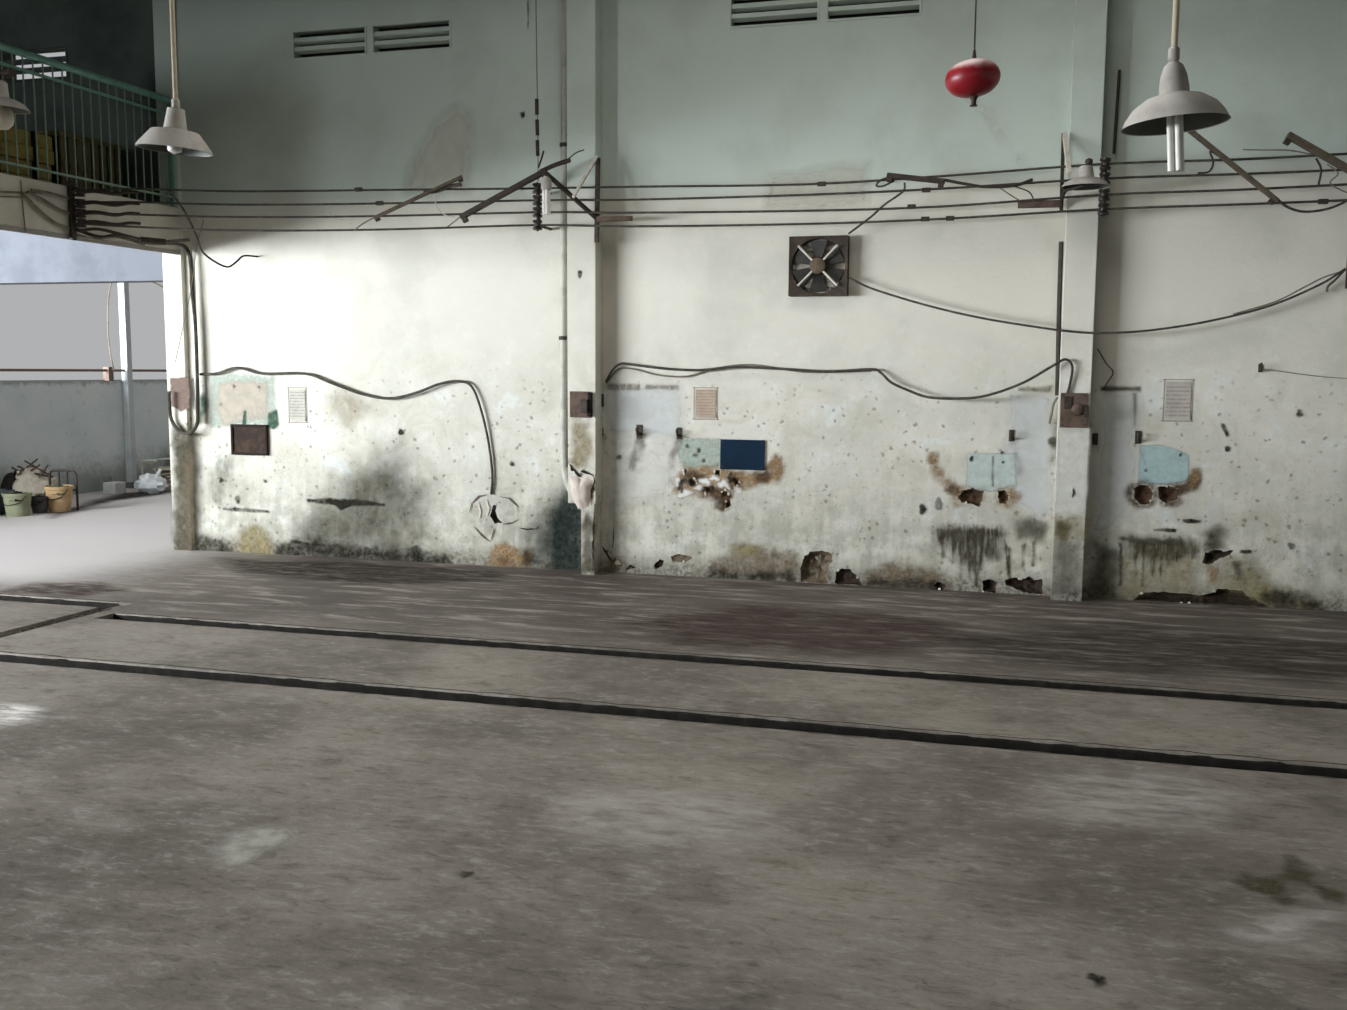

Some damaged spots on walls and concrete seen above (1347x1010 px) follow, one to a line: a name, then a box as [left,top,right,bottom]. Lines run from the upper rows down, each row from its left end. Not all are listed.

water stain [161,427,449,563]
spalling [675,467,742,511]
spalling [919,488,1019,514]
spalling [1126,483,1181,507]
water stain [536,493,596,571]
spalling [800,551,862,586]
water stain [869,564,938,590]
water stain [937,521,1074,590]
water stain [1091,528,1221,599]